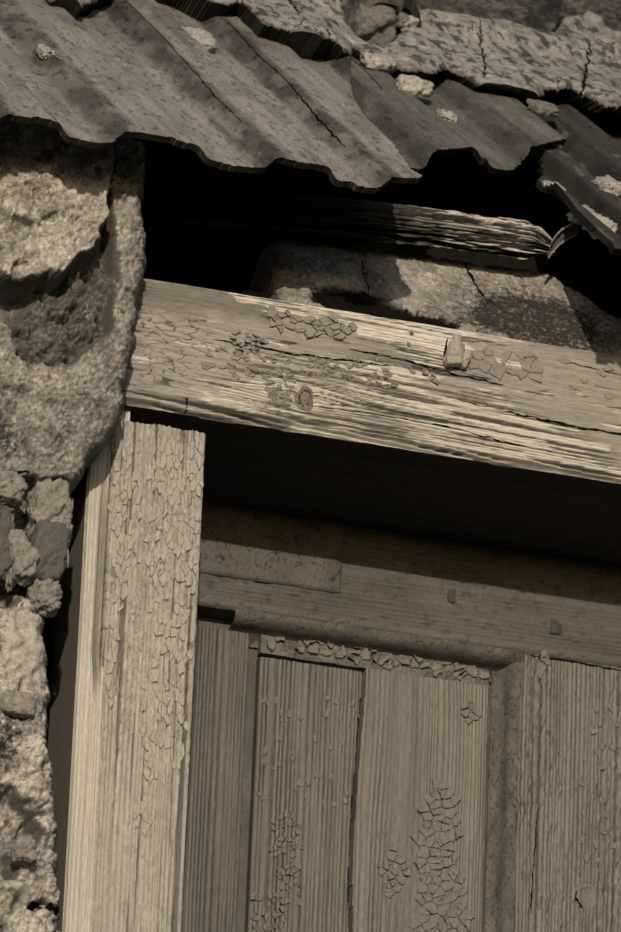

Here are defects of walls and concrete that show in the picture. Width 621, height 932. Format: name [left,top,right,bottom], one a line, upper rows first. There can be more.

crack [220,16,346,147]
crack [289,0,333,40]
crack [473,20,515,78]
crack [556,44,592,102]
peeling [267,306,358,340]
peeling [201,329,438,410]
peeling [468,345,543,383]
peeling [104,434,204,784]
peeling [294,640,490,680]
peeling [377,778,475,932]